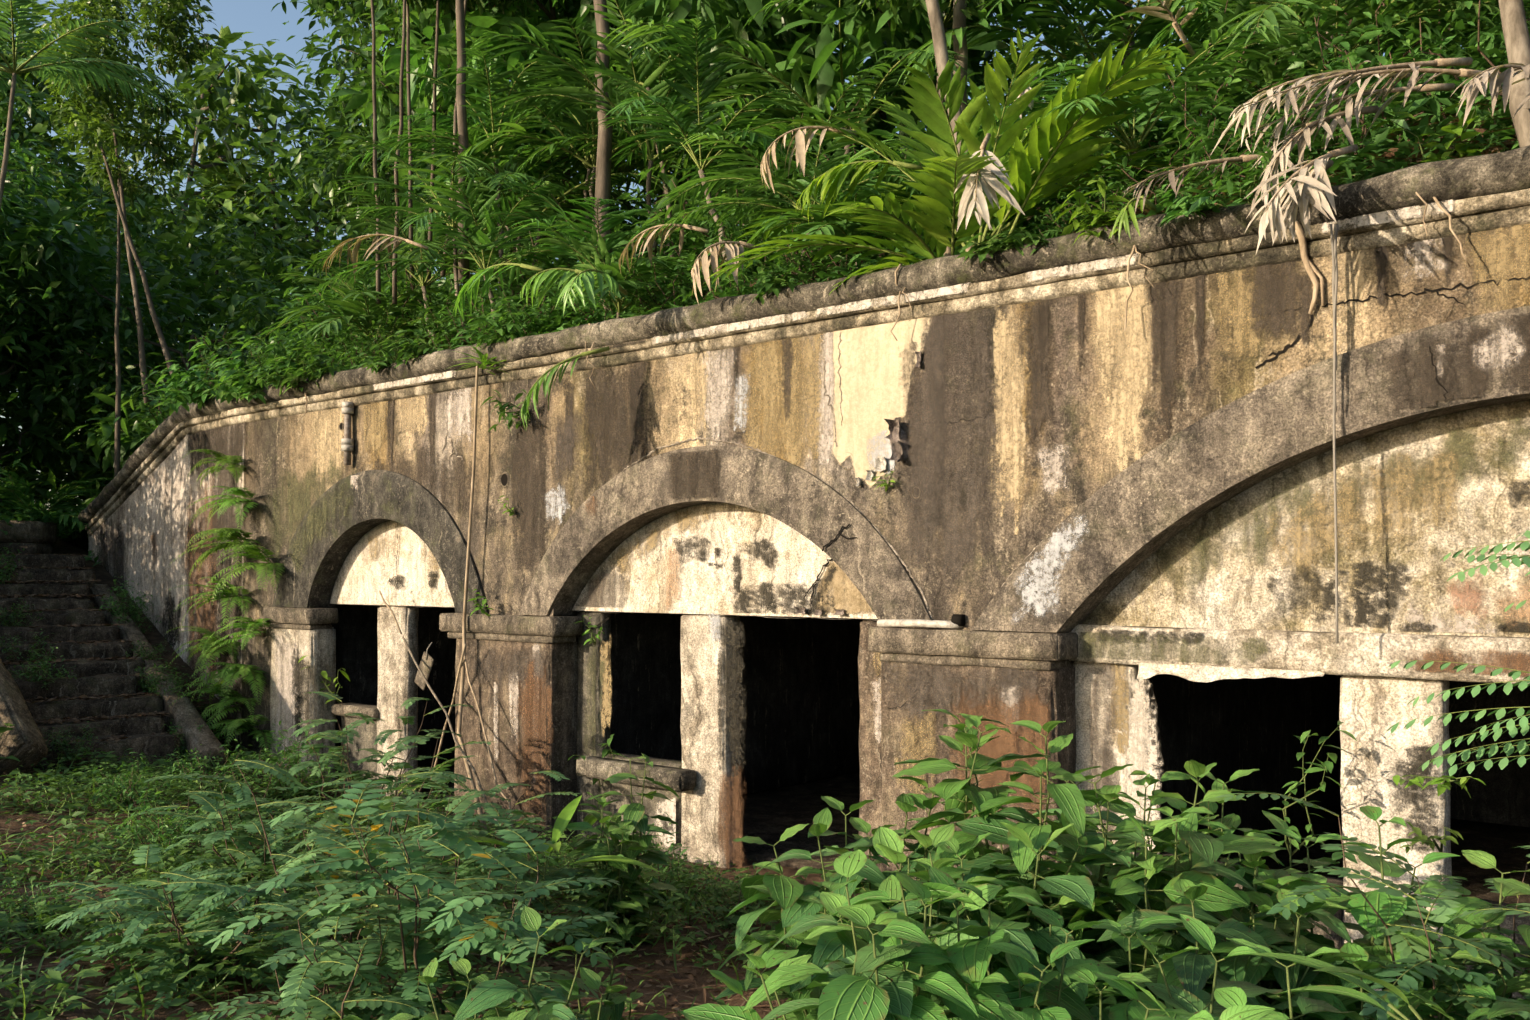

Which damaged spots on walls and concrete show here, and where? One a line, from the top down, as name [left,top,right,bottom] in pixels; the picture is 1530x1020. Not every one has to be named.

flaking render [653,282,969,487]
damp [844,301,1069,619]
damp [1077,260,1312,472]
damp [1155,429,1495,633]
crack [1255,276,1530,369]
crack [1429,346,1448,399]
damp [1496,418,1530,508]
corrosion [516,661,552,825]